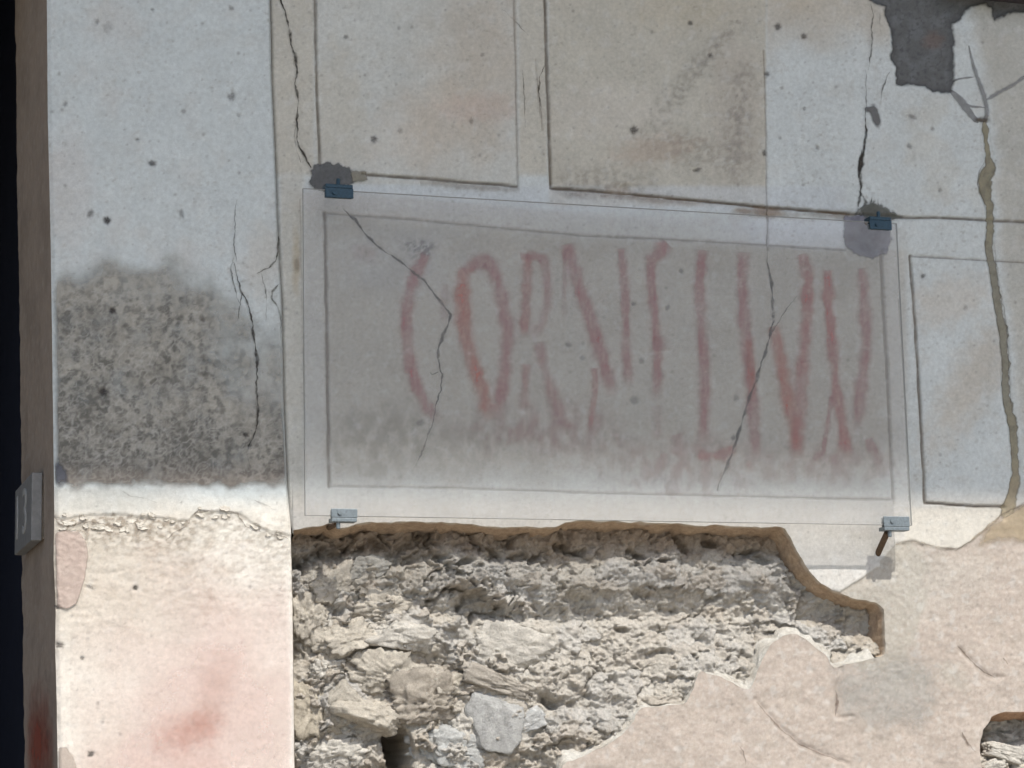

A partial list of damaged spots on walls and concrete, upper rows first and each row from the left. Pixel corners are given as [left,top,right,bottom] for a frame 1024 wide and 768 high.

crack [280,0,311,167]
crack [858,113,872,206]
crack [231,201,279,468]
crack [344,210,452,458]
crack [717,263,797,490]
crack [950,47,1024,517]
peeling [60,505,231,534]
spalling [250,520,886,768]
spalling [980,712,1024,768]